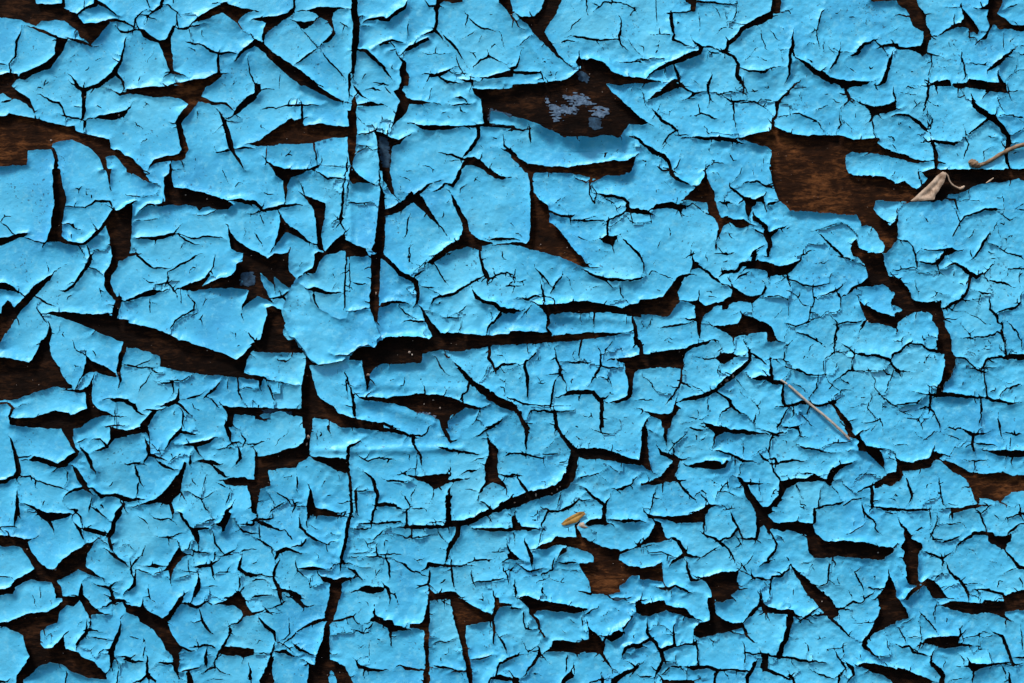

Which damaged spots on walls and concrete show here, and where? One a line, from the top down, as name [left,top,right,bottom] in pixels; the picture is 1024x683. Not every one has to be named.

crack [0,25,25,103]
crack [38,0,319,187]
peeling [243,43,426,206]
crack [244,0,557,252]
peeling [469,0,791,144]
crack [553,0,1024,306]
peeling [0,113,790,531]
crack [0,171,1024,683]
peeling [393,59,1024,683]